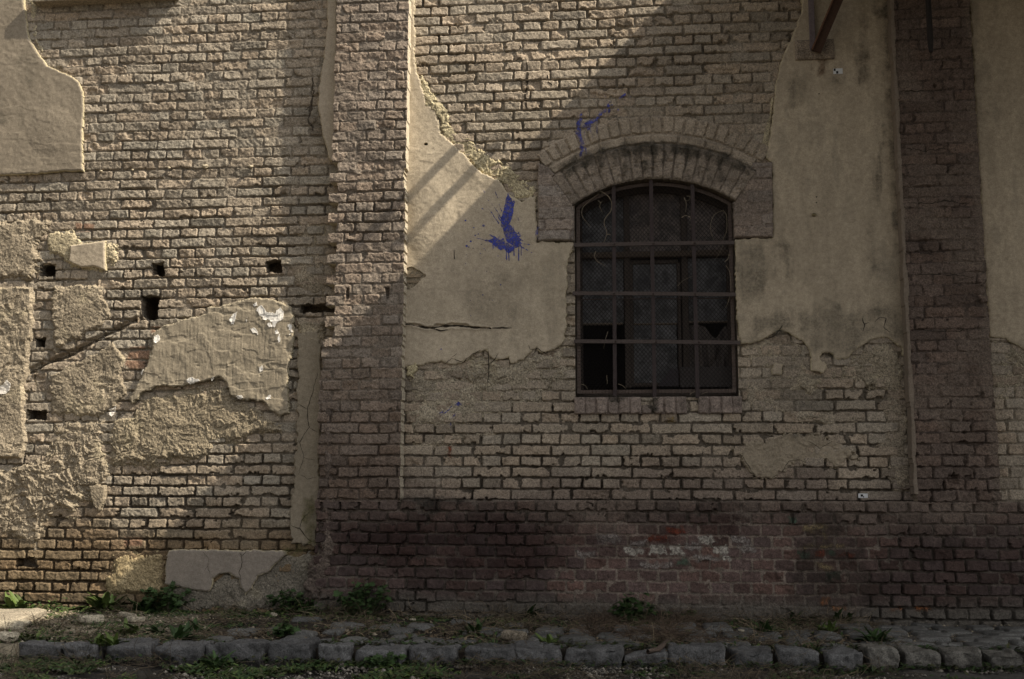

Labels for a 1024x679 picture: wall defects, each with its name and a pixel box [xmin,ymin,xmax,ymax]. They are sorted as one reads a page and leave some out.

spalling [420,75,536,198]
peeling [0,215,335,569]
spalling [105,390,339,611]
crack [406,324,508,381]